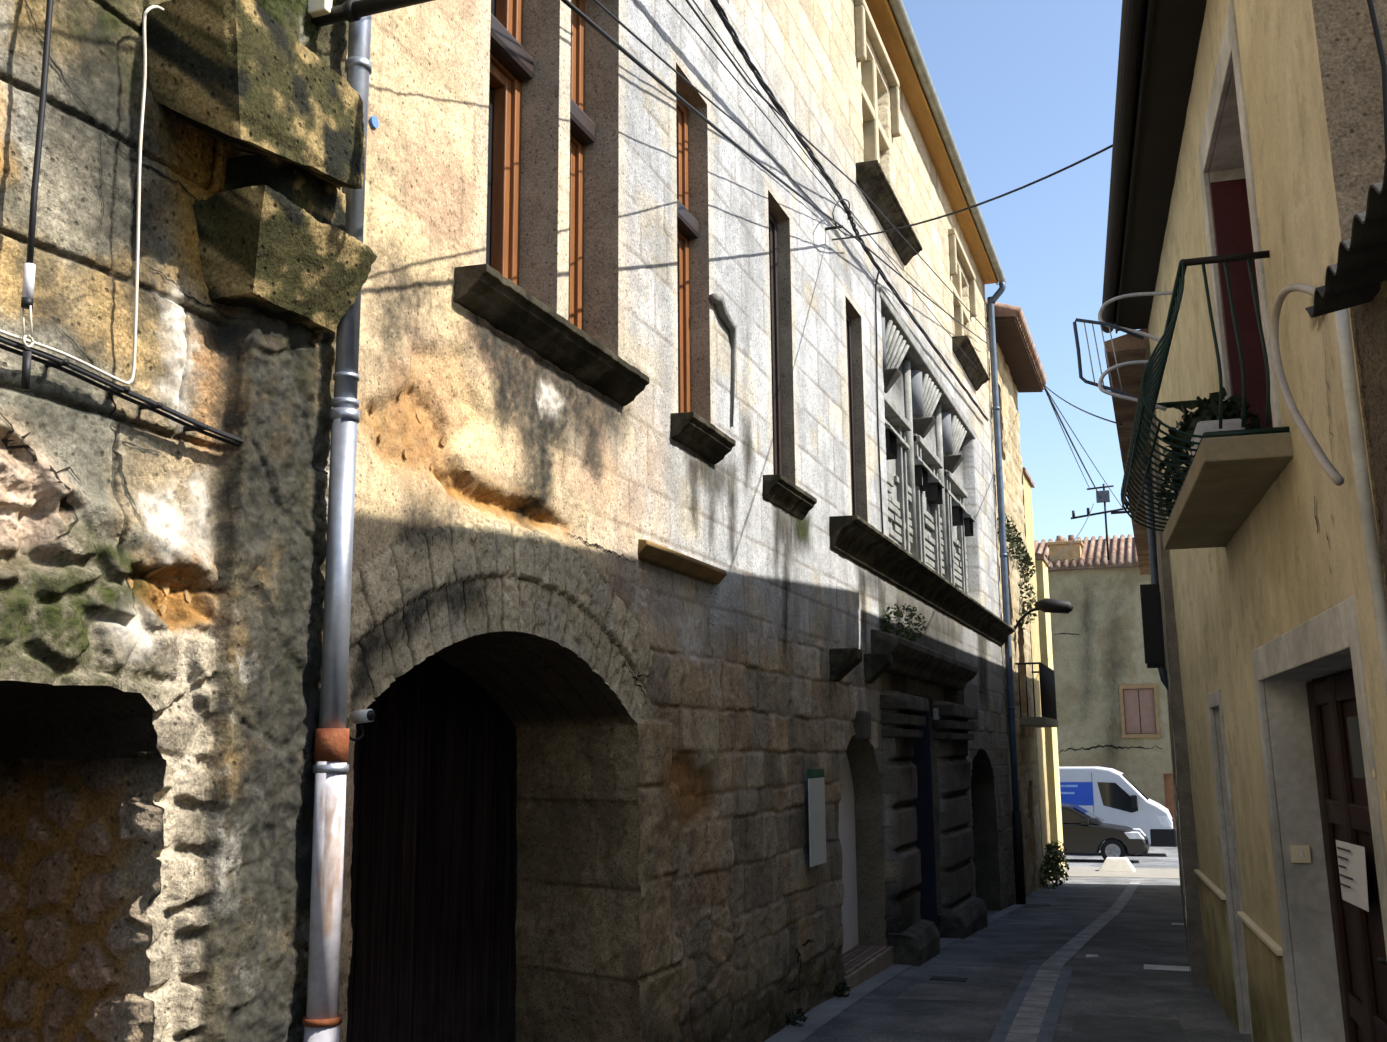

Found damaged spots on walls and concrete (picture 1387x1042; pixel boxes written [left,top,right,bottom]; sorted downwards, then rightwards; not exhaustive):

crack [0,412,82,538]
crack [61,330,162,528]
spalling [101,567,213,657]
peeling [140,482,210,556]
peeling [161,290,192,412]
damp [215,324,276,518]
spalling [444,470,546,526]
damp [475,314,625,515]
damp [690,426,751,560]
damp [776,507,809,637]